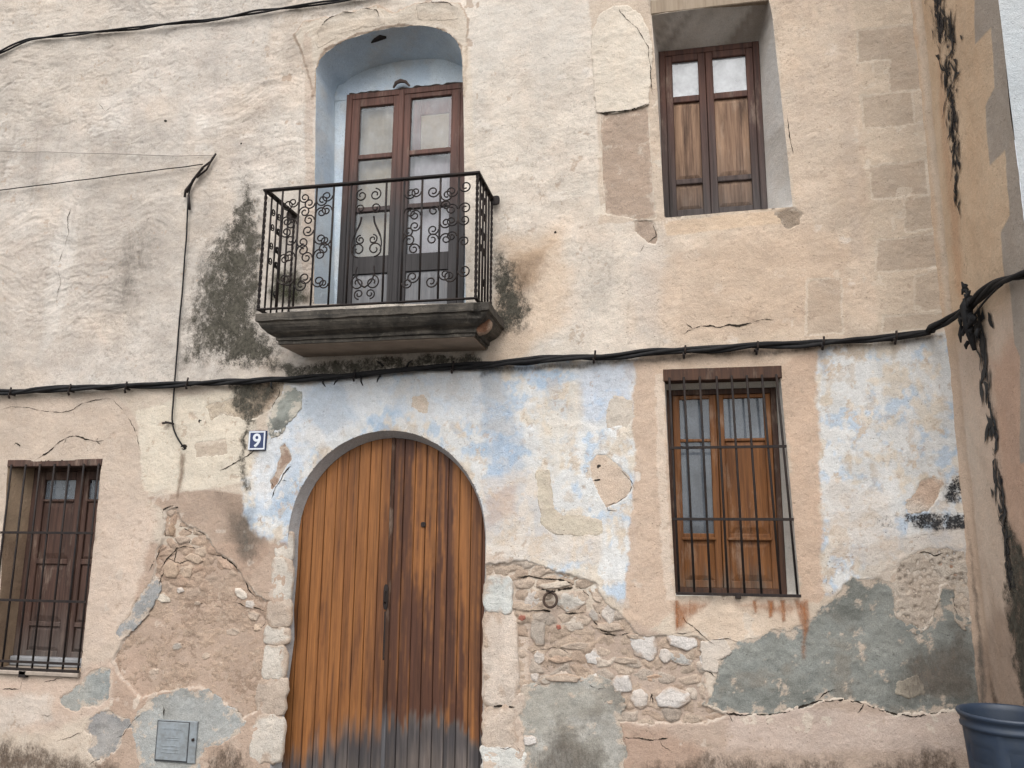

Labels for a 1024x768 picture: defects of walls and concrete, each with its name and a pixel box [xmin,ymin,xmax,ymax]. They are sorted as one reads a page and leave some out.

water stain [184,185,601,376]
crack [686,319,771,333]
crack [4,398,139,459]
water stain [229,383,275,490]
spalling [535,455,634,536]
corrosion [675,601,696,627]
corrosion [797,601,808,635]
peeling [700,548,979,716]
water stain [1004,522,1024,704]
peeling [59,667,246,768]
peeling [519,674,628,768]
crack [715,689,947,722]